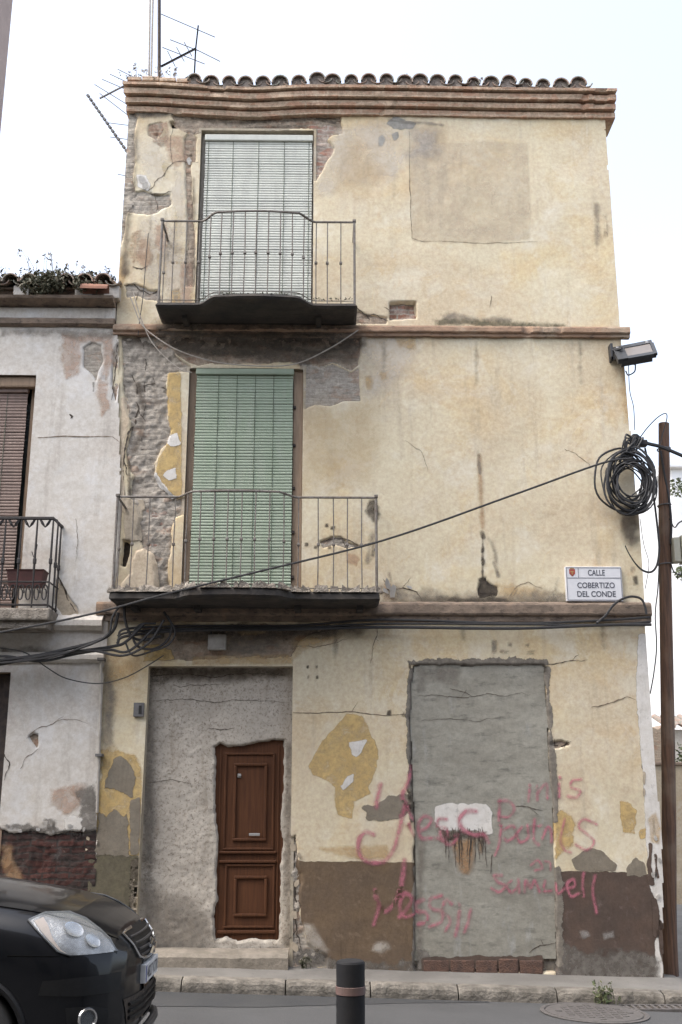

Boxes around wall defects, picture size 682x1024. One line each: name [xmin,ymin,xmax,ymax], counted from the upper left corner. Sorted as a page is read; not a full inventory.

crack [148,128,185,209]
flaking render [119,114,342,303]
flaking render [65,335,414,598]
crack [3,717,88,780]
peeling [36,749,142,910]
peeling [309,714,415,830]
peeling [552,633,664,978]